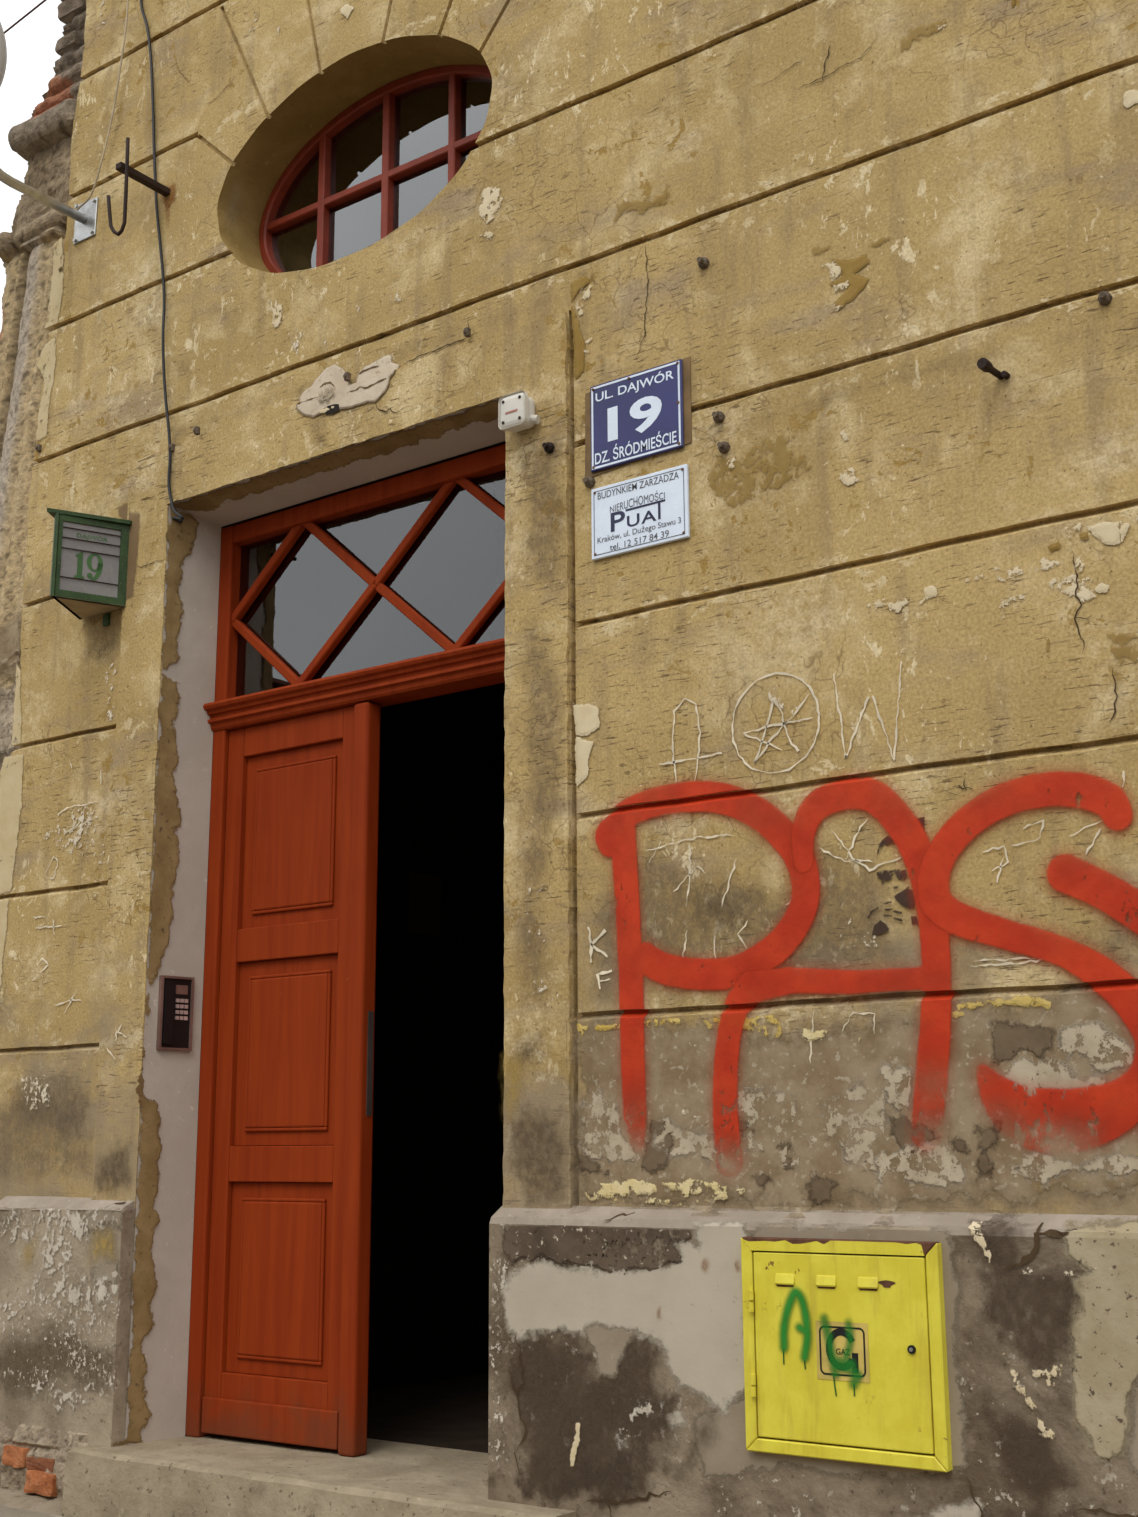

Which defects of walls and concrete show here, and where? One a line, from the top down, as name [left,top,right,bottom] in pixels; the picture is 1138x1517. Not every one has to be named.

flaking render [296,304,400,418]
peeling [145,400,499,1016]
crack [1072,551,1118,723]
peeling [1107,633,1138,665]
flaking render [566,982,1138,1218]
peeling [113,1049,162,1446]
flaking render [1064,1218,1138,1462]